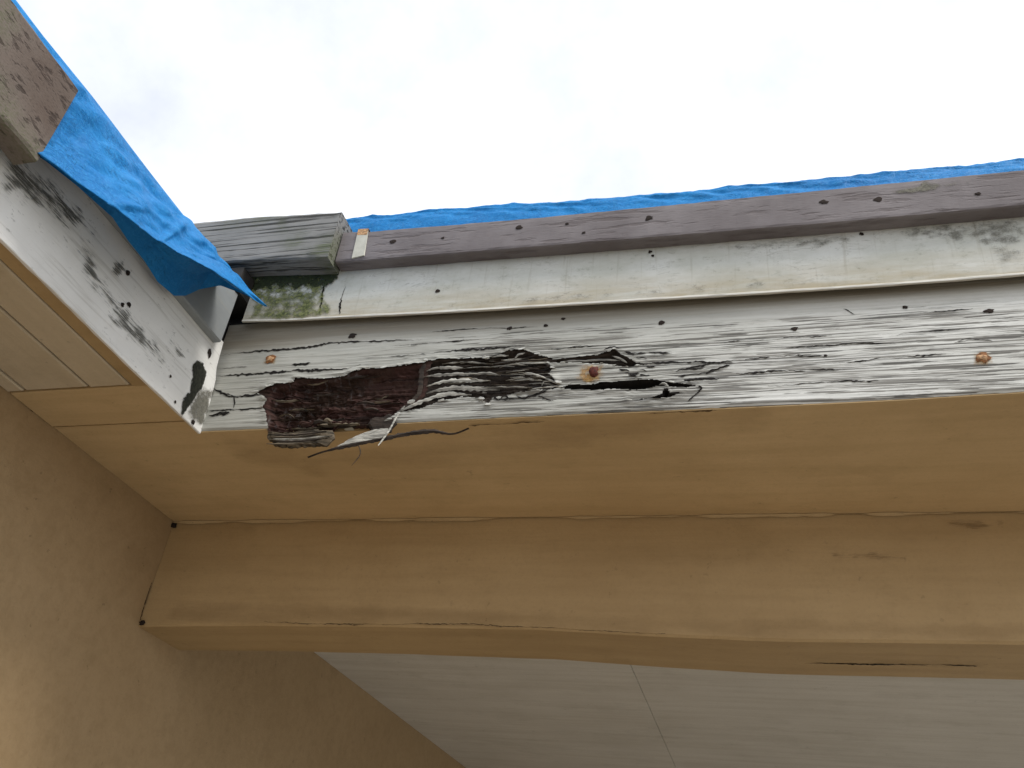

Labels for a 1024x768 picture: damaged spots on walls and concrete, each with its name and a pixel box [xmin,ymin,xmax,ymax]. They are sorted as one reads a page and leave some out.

damp [4,156,94,235]
damp [84,248,165,362]
crack [319,287,346,314]
spalling [396,347,571,413]
crack [471,390,553,426]
crack [209,308,991,416]
crack [810,660,905,668]